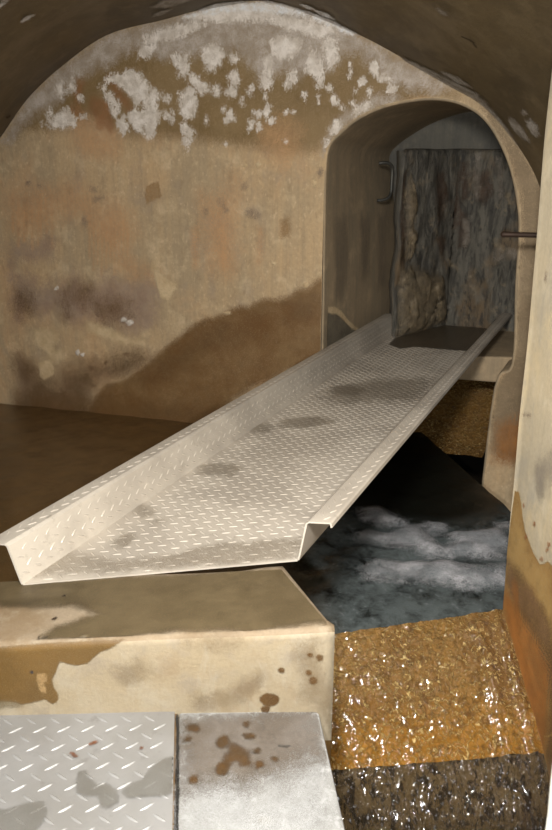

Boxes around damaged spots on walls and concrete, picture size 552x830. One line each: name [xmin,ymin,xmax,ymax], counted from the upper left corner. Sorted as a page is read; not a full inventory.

water stain [0,0,541,463]
peeling [30,671,48,693]